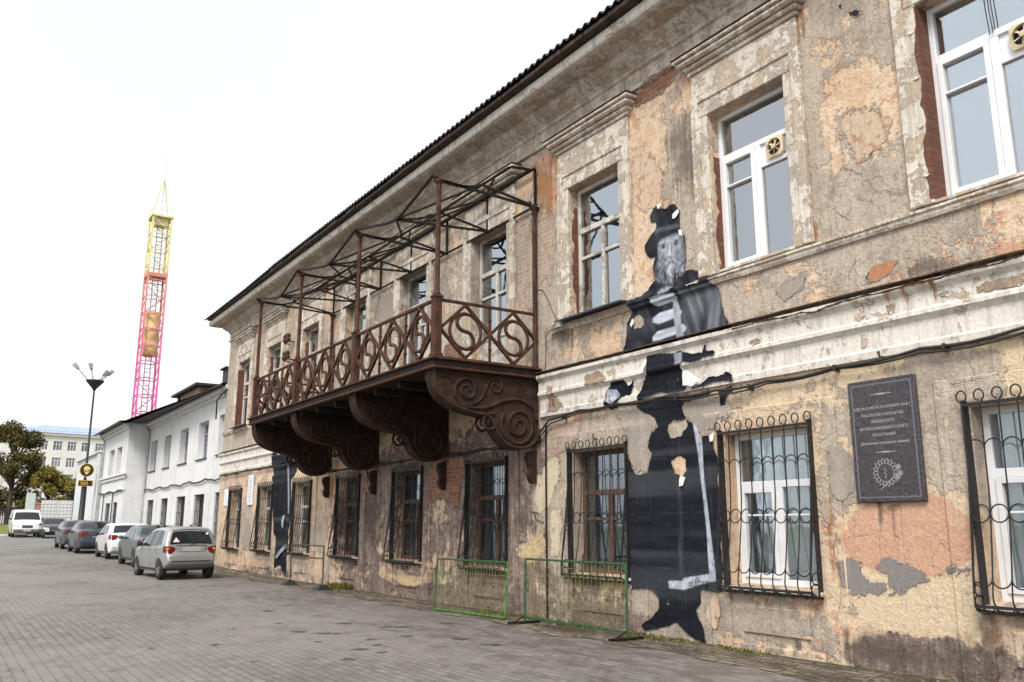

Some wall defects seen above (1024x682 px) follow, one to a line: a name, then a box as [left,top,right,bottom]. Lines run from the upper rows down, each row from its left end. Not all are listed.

flaking render [634,66,679,108]
flaking render [908,6,947,199]
spalling [838,105,893,164]
spalling [631,143,664,214]
peeling [775,272,806,302]
spalling [866,260,898,283]
flaking render [427,454,465,512]
spalling [515,456,563,566]
peeling [836,557,971,597]